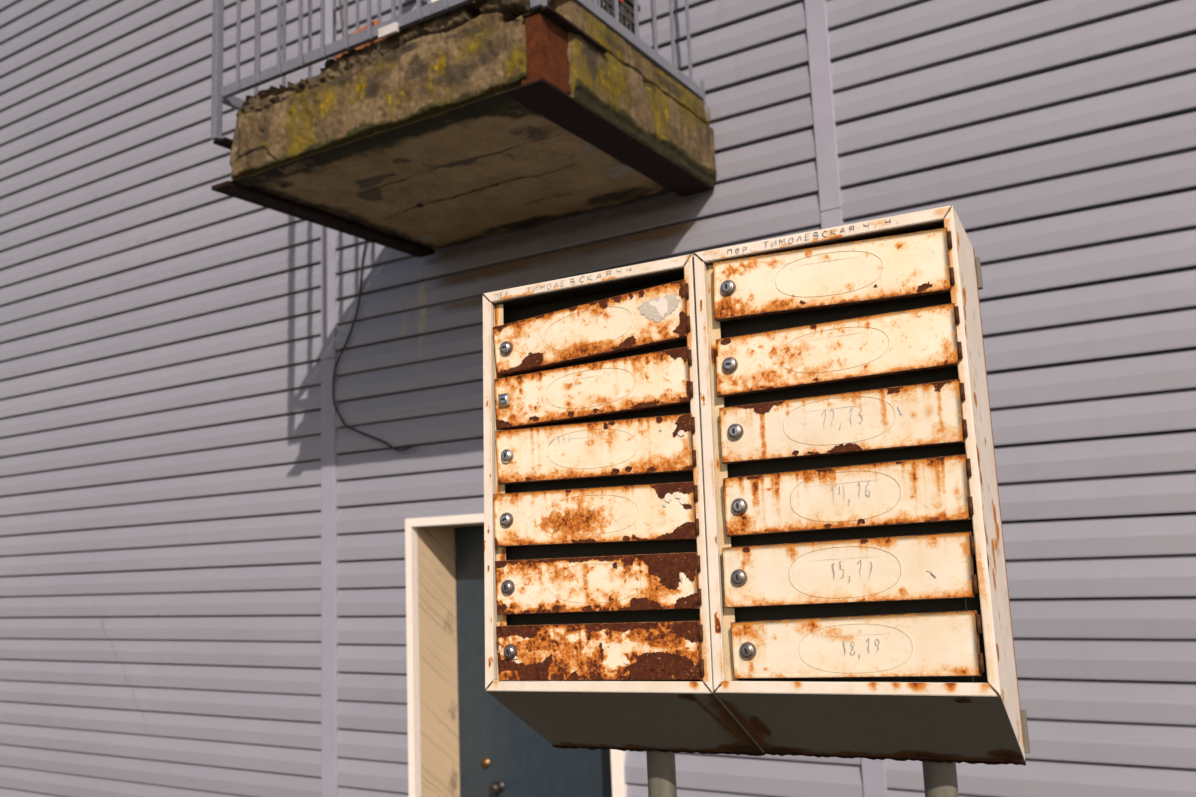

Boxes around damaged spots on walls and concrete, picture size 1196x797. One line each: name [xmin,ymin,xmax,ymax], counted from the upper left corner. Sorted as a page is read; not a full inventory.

leakage [303,40,500,117]
crack [367,135,575,219]